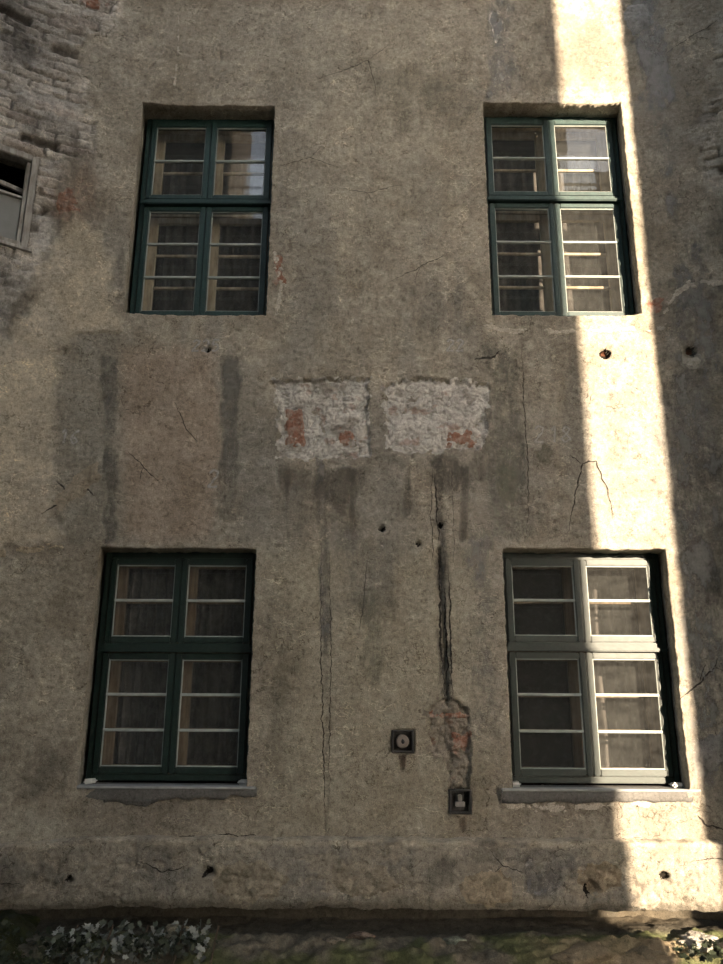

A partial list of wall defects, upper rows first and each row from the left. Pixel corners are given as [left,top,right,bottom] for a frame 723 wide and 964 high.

spalling [271,376,491,462]
crack [567,456,613,533]
spalling [423,695,473,793]